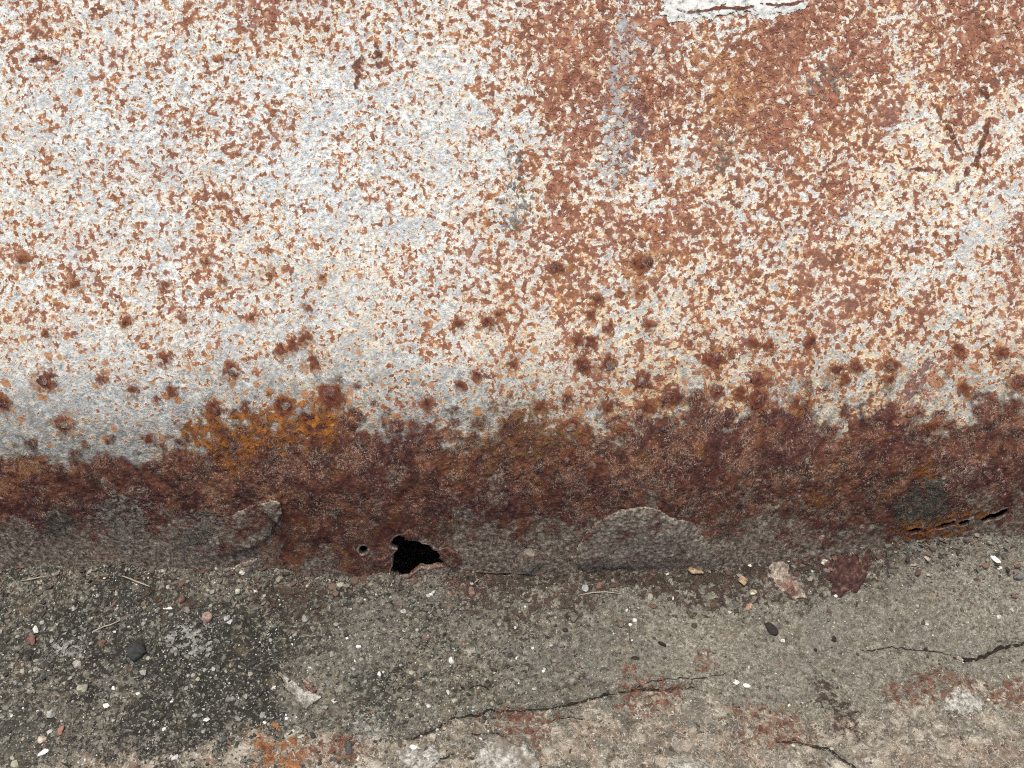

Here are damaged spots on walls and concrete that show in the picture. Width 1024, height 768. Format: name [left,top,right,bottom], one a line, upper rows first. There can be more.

corrosion [511,0,1024,375]
corrosion [480,308,503,330]
corrosion [0,336,1024,599]
peeling [400,529,420,541]
crack [864,642,1024,662]
crack [391,673,725,741]